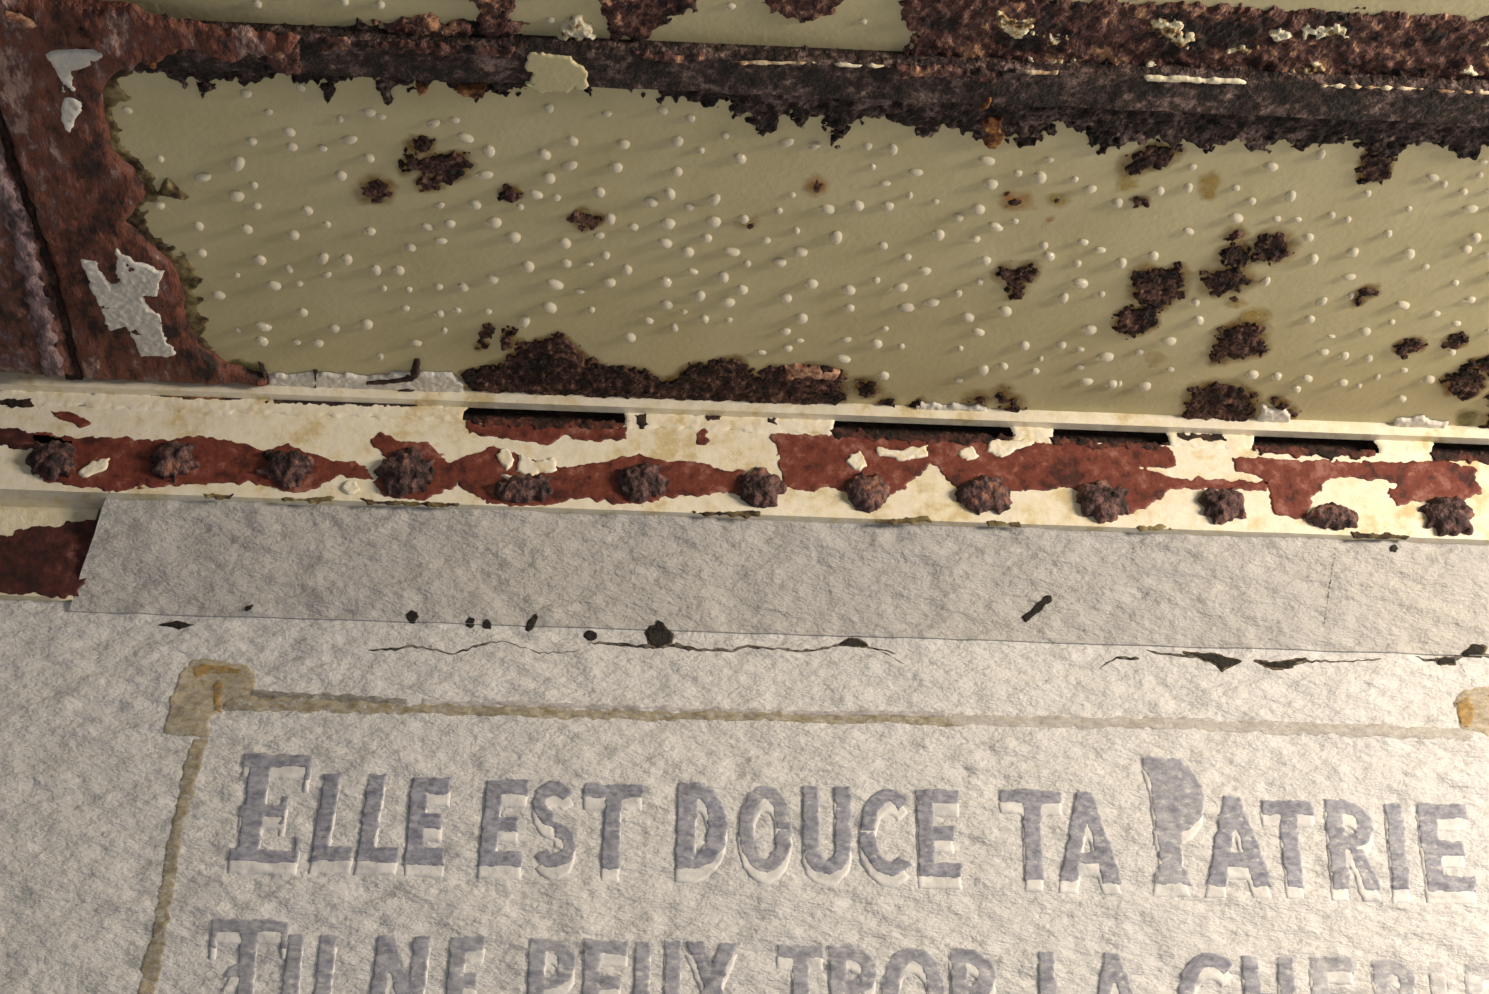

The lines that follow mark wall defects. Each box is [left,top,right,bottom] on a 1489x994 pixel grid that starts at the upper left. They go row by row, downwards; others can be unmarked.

corrosion [892,0,1489,149]
corrosion [1354,148,1398,185]
corrosion [1049,229,1302,450]
peeling [268,371,465,392]
corrosion [1393,331,1489,429]
peeling [0,411,745,507]
peeling [769,433,1482,520]
corrosion [1252,444,1376,461]
peeling [0,520,98,599]
crack [368,620,904,664]
spalling [1022,595,1052,622]
crack [1099,644,1489,672]